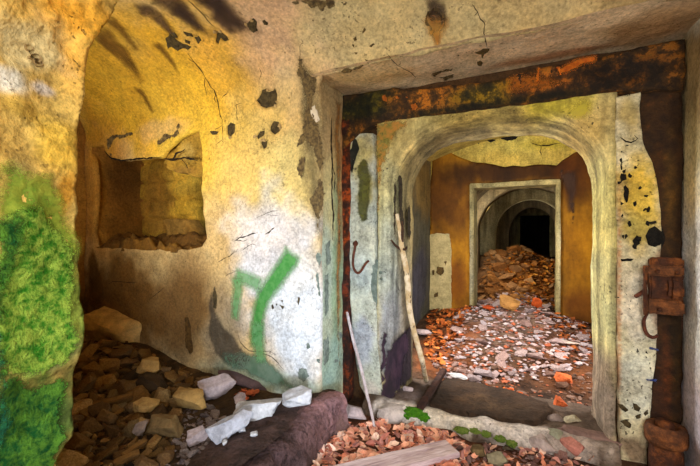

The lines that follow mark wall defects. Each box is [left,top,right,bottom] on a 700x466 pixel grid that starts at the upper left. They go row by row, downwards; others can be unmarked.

spalling [213,30,229,44]
spalling [244,18,268,33]
corrosion [511,56,596,91]
crack [188,54,240,145]
spalling [257,88,277,108]
peeling [297,59,324,170]
spalling [253,121,281,149]
crack [105,149,197,168]
peeling [297,157,306,178]
peeling [617,158,650,212]
peeling [310,179,325,227]
spalling [621,214,665,249]